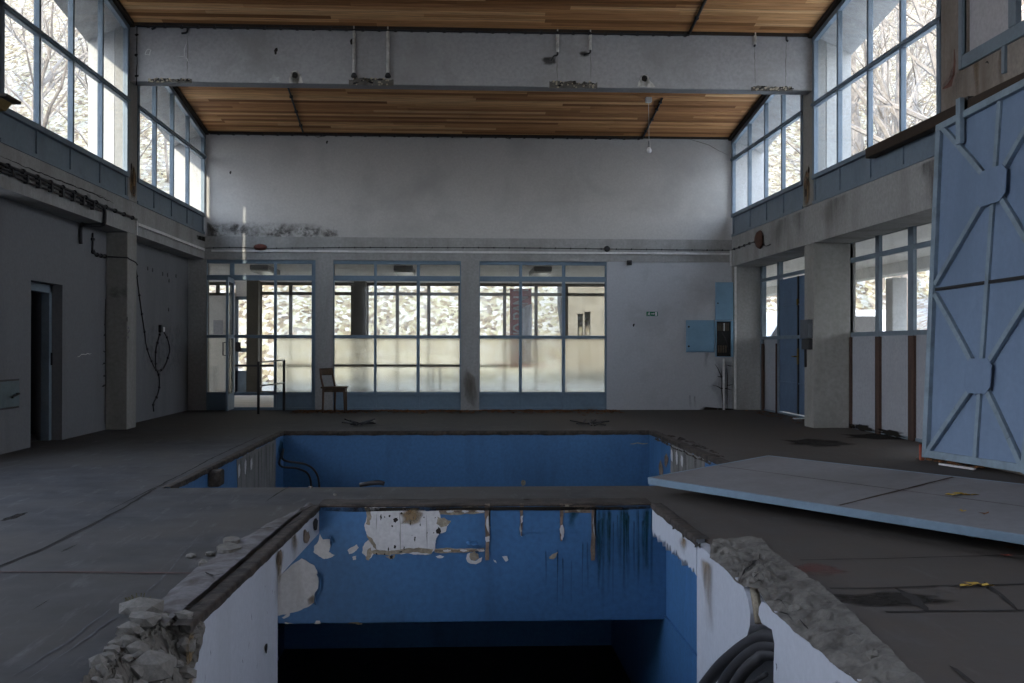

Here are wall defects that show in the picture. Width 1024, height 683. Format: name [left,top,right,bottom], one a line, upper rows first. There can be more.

spalling [188,512,334,683]
peeling [348,507,451,560]
spalling [612,503,862,683]